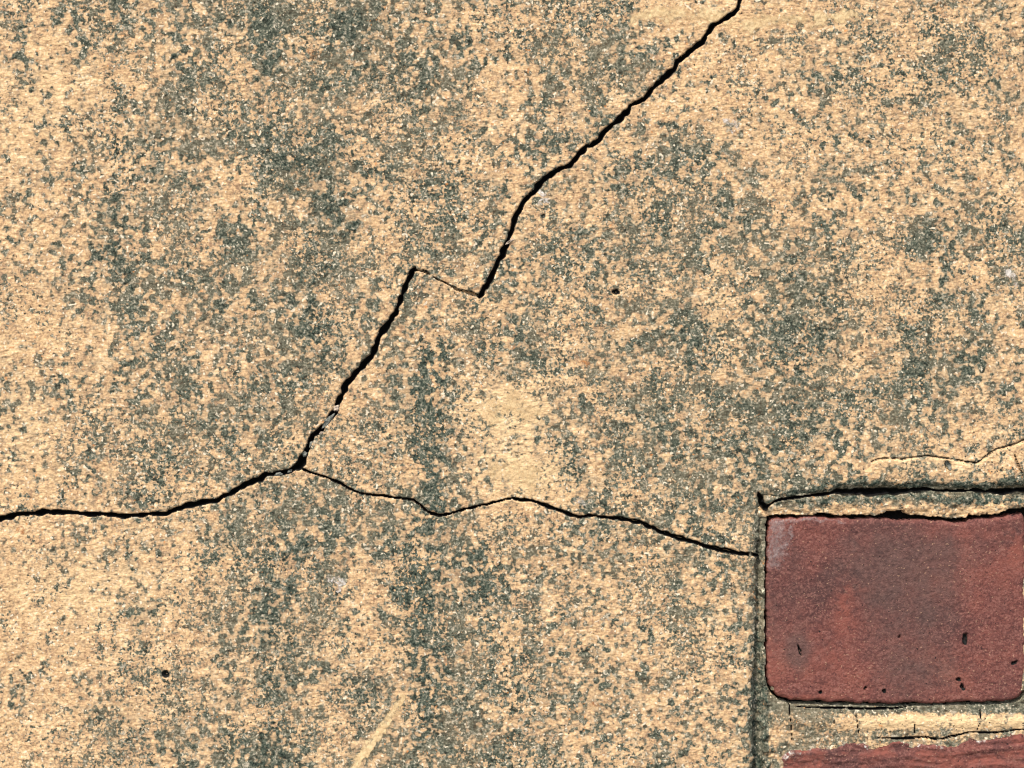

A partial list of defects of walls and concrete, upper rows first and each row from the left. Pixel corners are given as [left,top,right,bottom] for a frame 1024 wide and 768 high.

crack [0,0,1024,573]